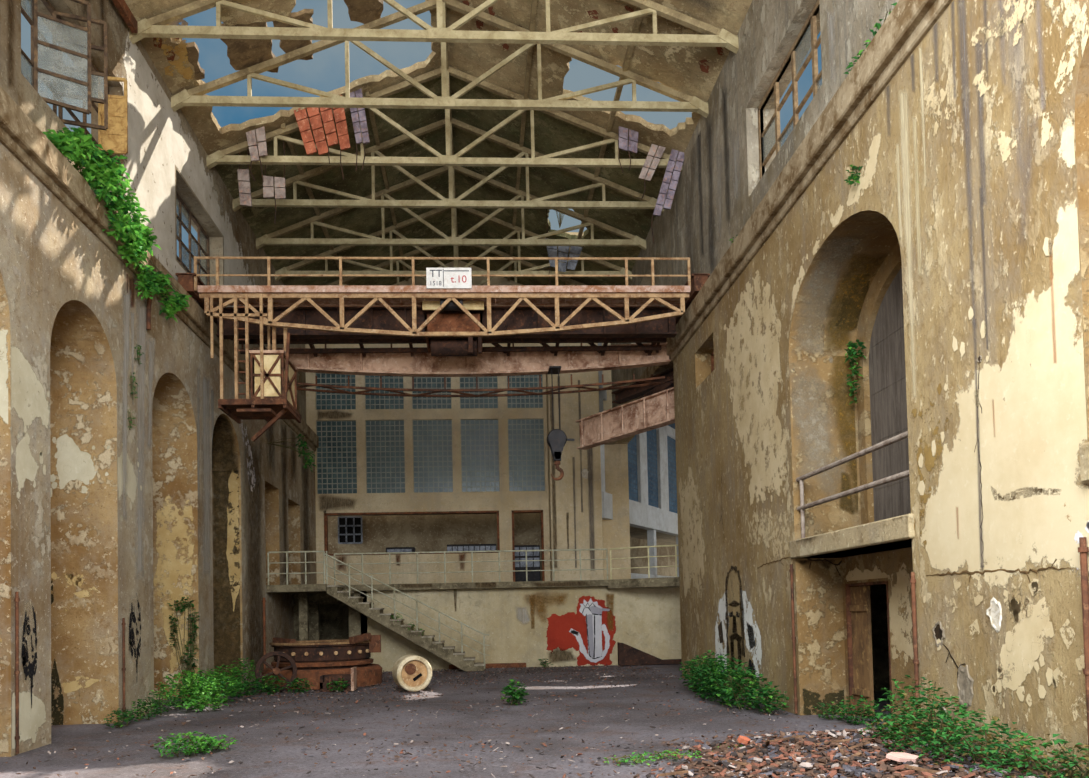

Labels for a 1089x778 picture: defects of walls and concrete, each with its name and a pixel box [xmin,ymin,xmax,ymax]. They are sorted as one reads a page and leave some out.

peeling [924,74,954,136]
peeling [973,70,991,97]
peeling [971,0,1036,46]
peeling [997,131,1017,163]
peeling [1041,112,1075,169]
peeling [1054,11,1080,94]
leakage [887,48,926,395]
leakage [952,0,988,568]
peeling [724,128,885,562]
crack [926,353,1073,582]
peeling [911,199,1089,711]
peeling [61,676,99,693]